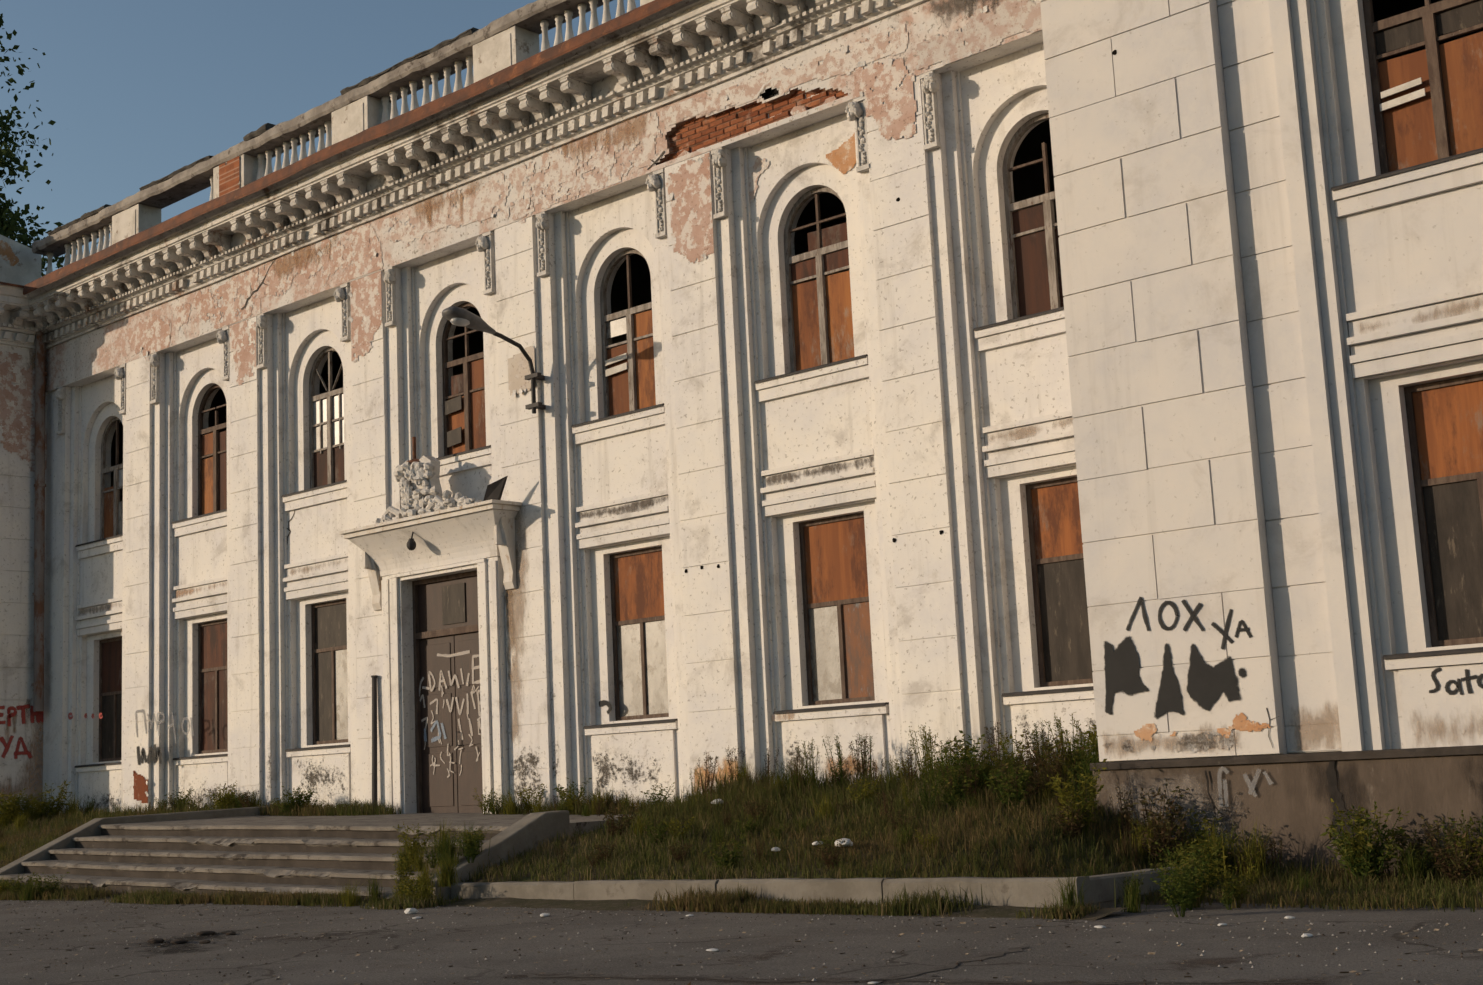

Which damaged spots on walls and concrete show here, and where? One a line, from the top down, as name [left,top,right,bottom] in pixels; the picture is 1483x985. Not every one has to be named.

peeling [129,0,1042,386]
peeling [0,351,47,472]
damp [505,514,559,806]